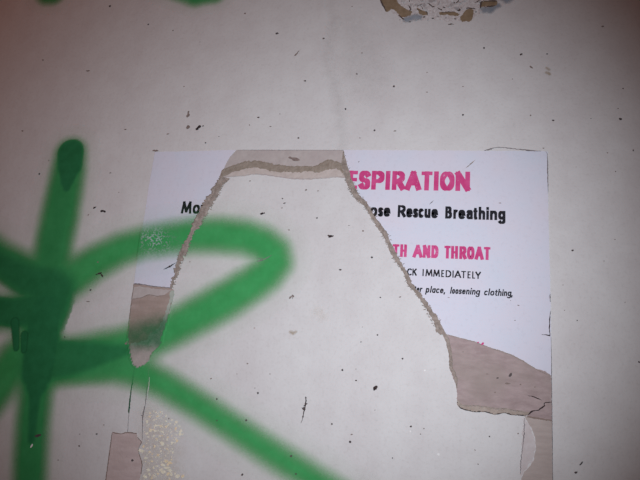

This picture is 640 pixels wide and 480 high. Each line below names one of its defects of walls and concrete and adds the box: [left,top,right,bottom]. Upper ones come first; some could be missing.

peeling [380,0,504,25]